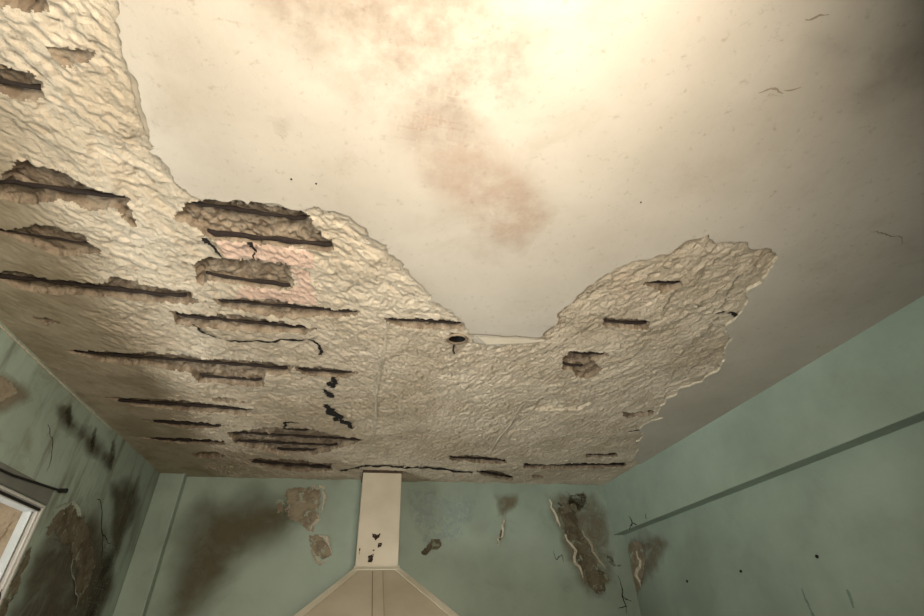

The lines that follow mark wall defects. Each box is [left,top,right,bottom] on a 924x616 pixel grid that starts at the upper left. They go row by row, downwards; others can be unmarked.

spalling [0,0,776,565]
leakage [15,486,136,616]
peeling [549,499,609,594]
peeling [628,539,645,594]